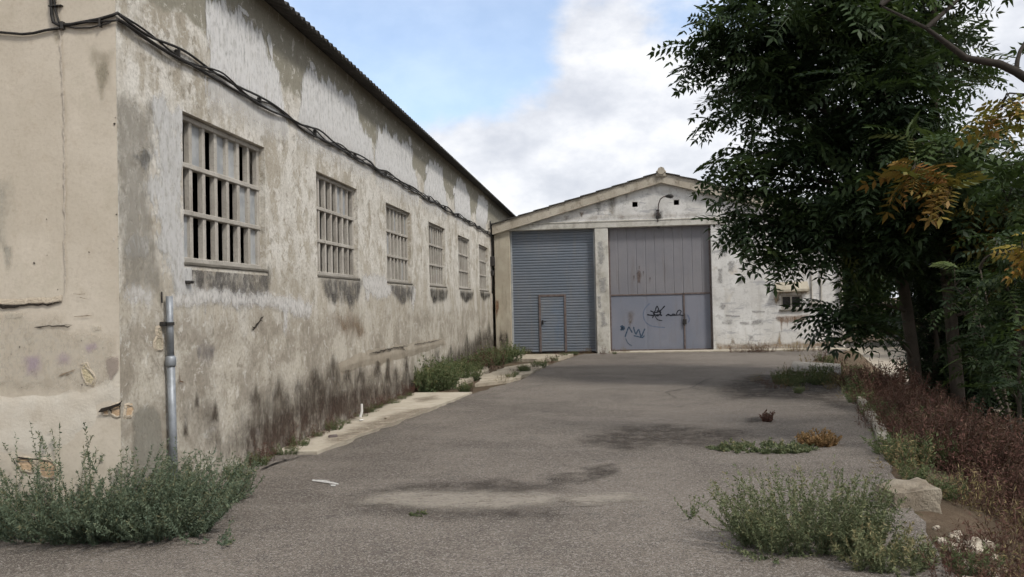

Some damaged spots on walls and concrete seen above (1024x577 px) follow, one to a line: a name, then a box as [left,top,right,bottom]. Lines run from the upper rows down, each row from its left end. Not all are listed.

leakage [325,274,416,307]
peeling [0,313,111,388]
spalling [101,402,135,419]
leakage [246,359,416,449]
spalling [16,455,59,480]